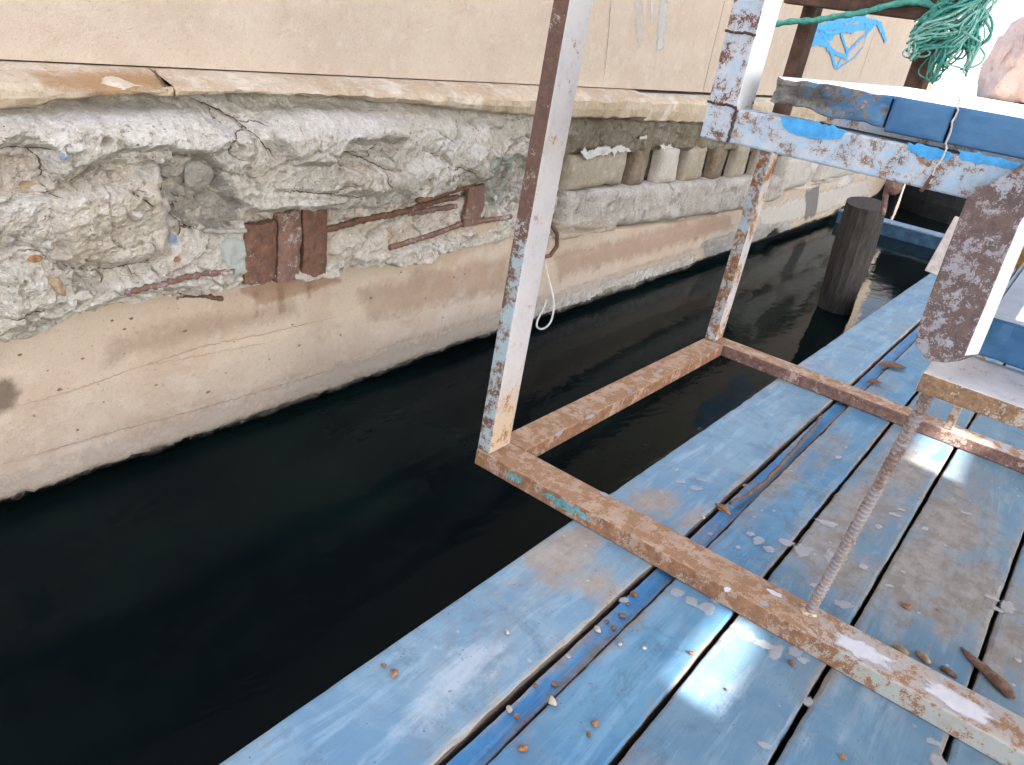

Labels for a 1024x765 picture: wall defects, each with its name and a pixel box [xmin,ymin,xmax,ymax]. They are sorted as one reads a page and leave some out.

crack [154,69,168,90]
crack [192,98,275,161]
spalling [643,150,653,181]
spalling [0,93,534,312]
spalling [752,221,793,242]
spalling [533,231,736,319]
spalling [0,315,72,343]
damp [0,381,16,409]
crack [1,315,343,412]
crack [28,336,448,457]